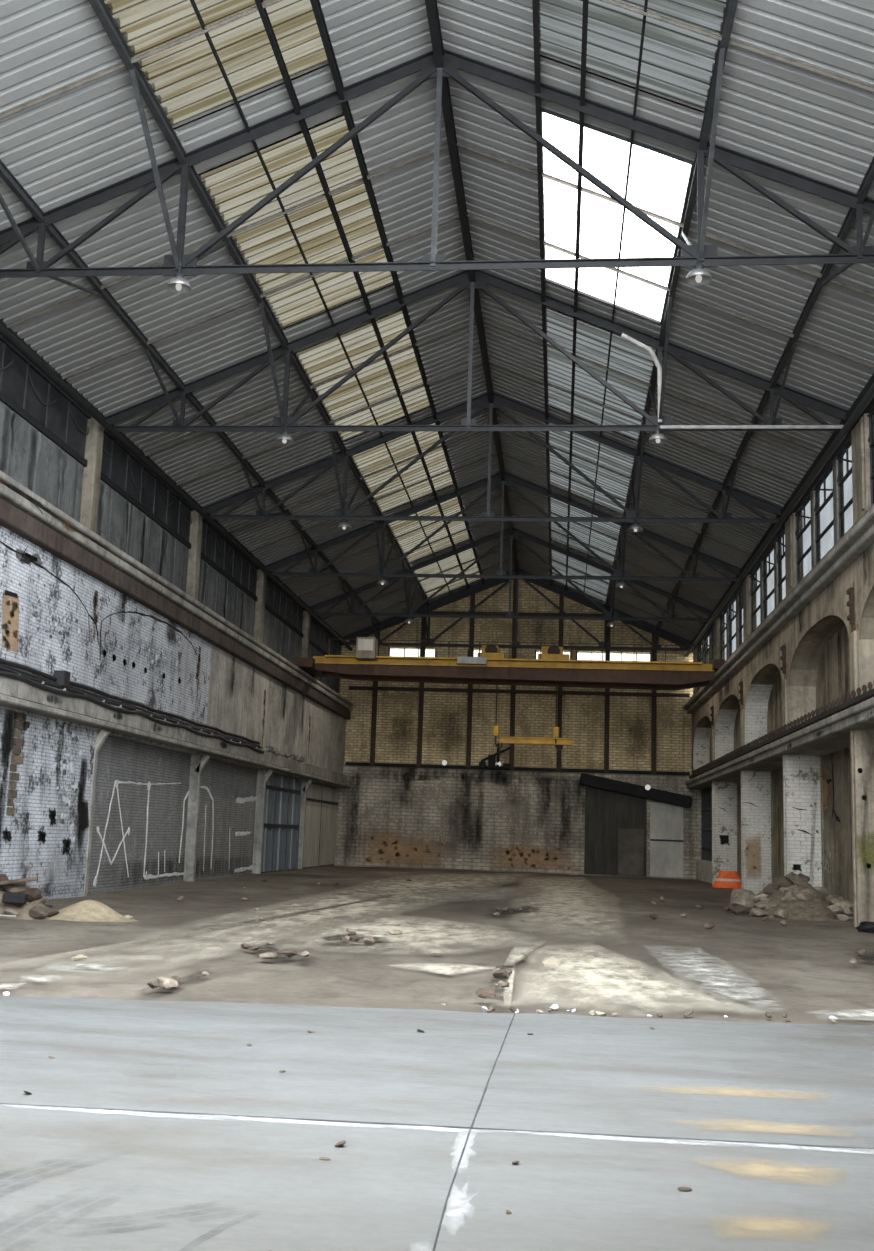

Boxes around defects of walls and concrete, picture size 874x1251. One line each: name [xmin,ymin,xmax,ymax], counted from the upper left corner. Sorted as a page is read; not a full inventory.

spalling [16,549,43,566]
flaking render [1,590,81,651]
peeling [103,636,181,684]
flaking render [2,712,30,843]
peeling [37,696,82,856]
leakage [384,767,444,800]